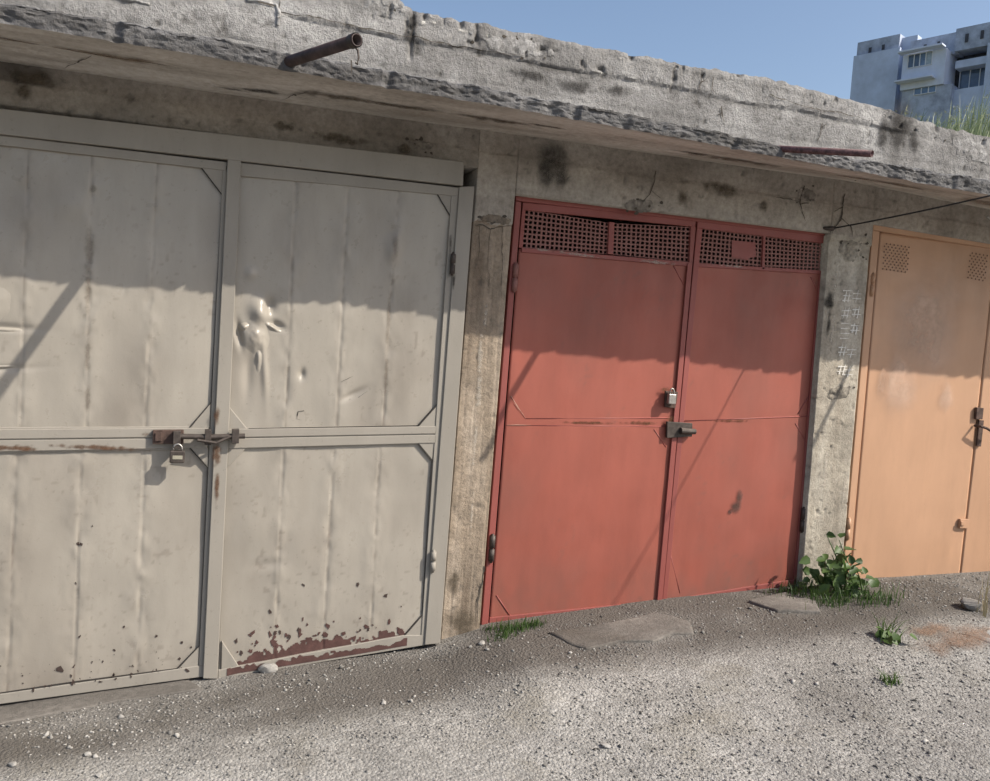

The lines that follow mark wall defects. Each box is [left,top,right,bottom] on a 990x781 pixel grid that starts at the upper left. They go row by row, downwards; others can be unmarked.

leakage [879,111,918,148]
peeling [227,617,407,676]